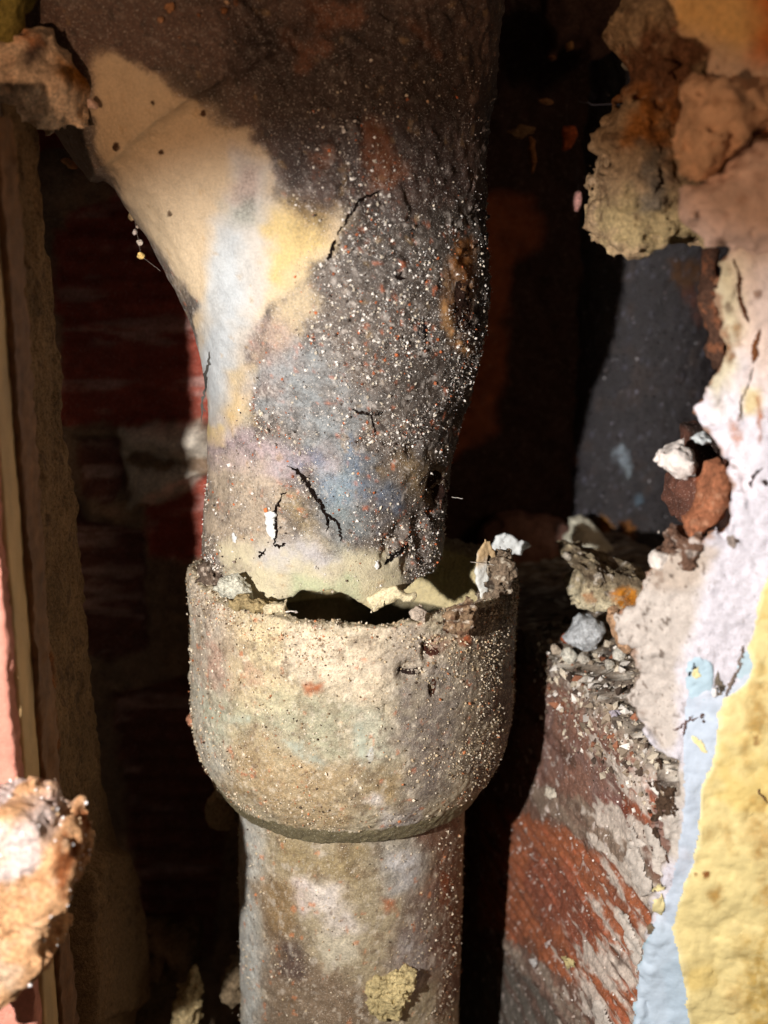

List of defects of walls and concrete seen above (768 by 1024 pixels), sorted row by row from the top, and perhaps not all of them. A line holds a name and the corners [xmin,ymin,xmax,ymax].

crack [326,190,381,261]
crack [258,466,342,558]
spalling [384,535,411,565]
spalling [648,549,668,570]